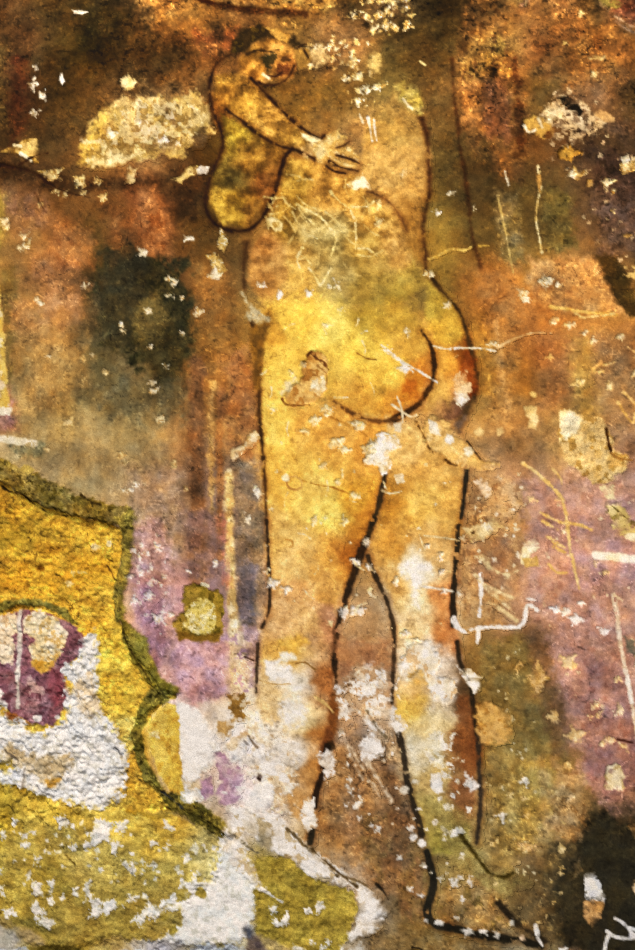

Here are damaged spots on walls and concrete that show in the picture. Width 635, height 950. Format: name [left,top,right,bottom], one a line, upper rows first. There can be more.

peeling [0,72,217,210]
spalling [521,84,635,281]
spalling [0,483,226,814]
spalling [215,691,254,743]
spalling [239,853,360,950]
leakage [340,671,430,836]
spalling [242,604,581,824]
leakage [406,884,426,899]
leakage [393,756,475,817]
spalling [408,729,568,943]
leakage [516,776,530,789]
leakage [417,804,635,950]